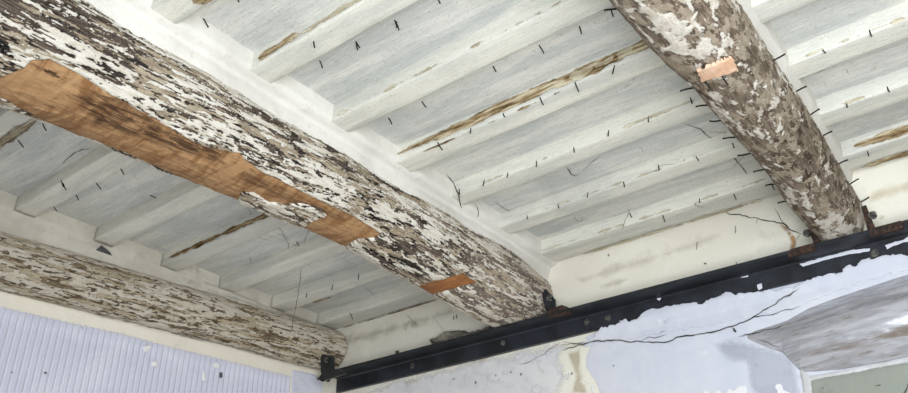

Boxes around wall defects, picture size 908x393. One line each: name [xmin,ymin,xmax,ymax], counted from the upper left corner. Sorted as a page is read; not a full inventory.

peeling [800,248,870,267]
crack [523,288,800,364]
peeling [584,270,908,393]